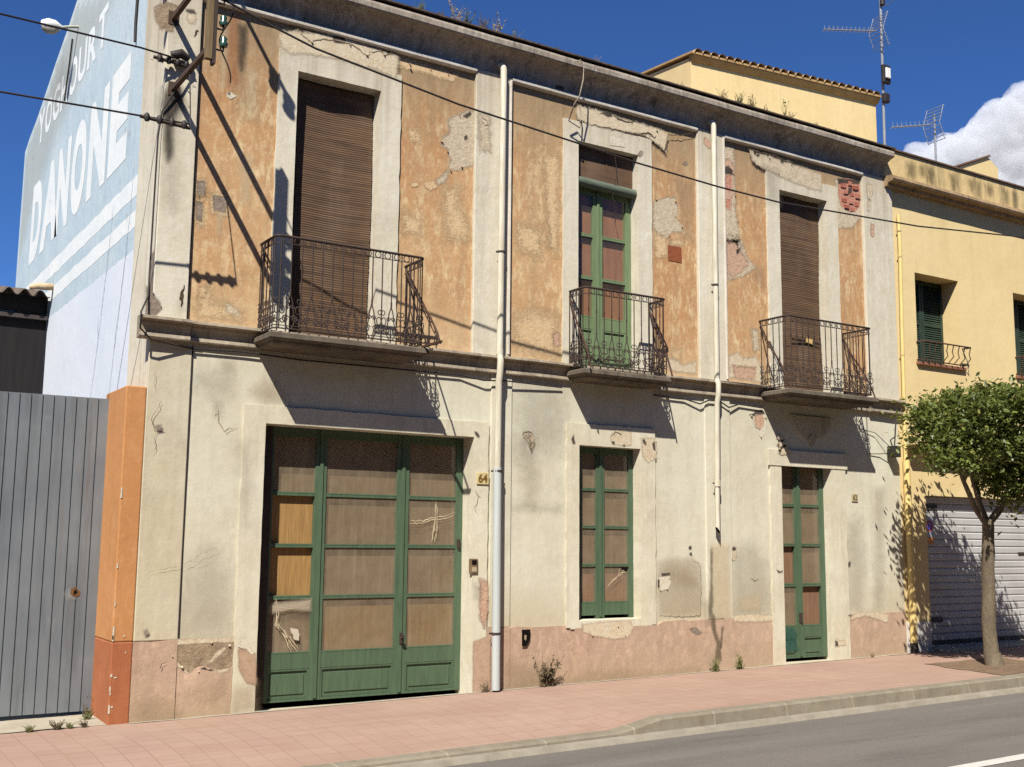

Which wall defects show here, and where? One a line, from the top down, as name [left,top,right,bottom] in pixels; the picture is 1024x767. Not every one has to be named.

flaking render [576,105,711,152]
peeling [408,110,474,242]
flaking render [749,149,822,191]
peeling [652,196,684,263]
flaking render [725,146,755,280]
crack [151,372,165,450]
spalling [611,430,657,463]
flaking render [750,410,767,438]
flaking render [657,573,671,591]
peeling [581,620,633,639]
flaking render [172,637,257,685]